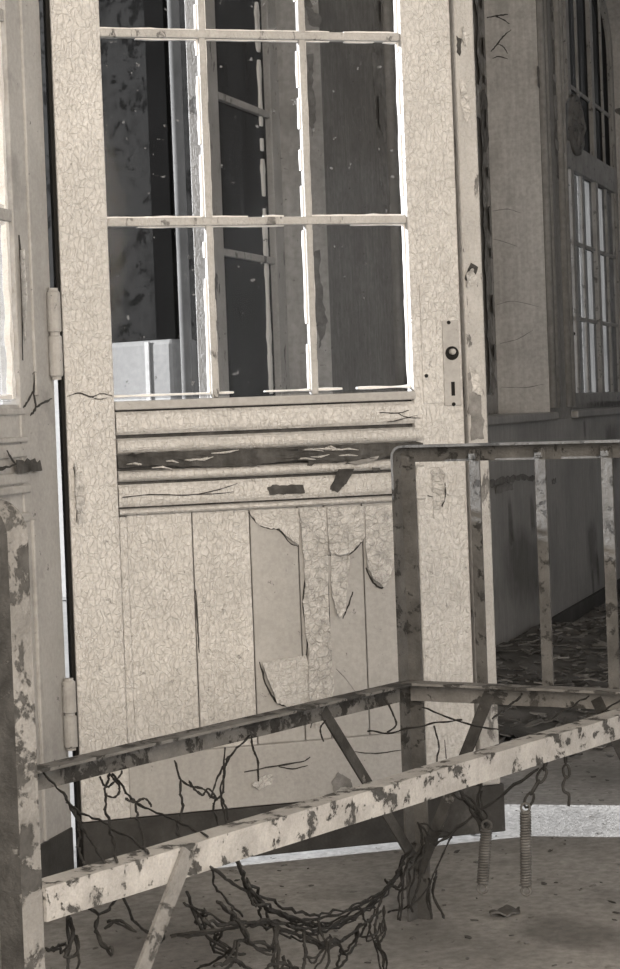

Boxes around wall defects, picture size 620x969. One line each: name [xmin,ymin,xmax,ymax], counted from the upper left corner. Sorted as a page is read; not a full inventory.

crack [487,14,511,59]
spalling [547,0,566,179]
crack [23,373,112,416]
crack [0,450,16,471]
spalling [267,484,305,495]
crack [193,590,201,653]
peeling [248,504,394,707]